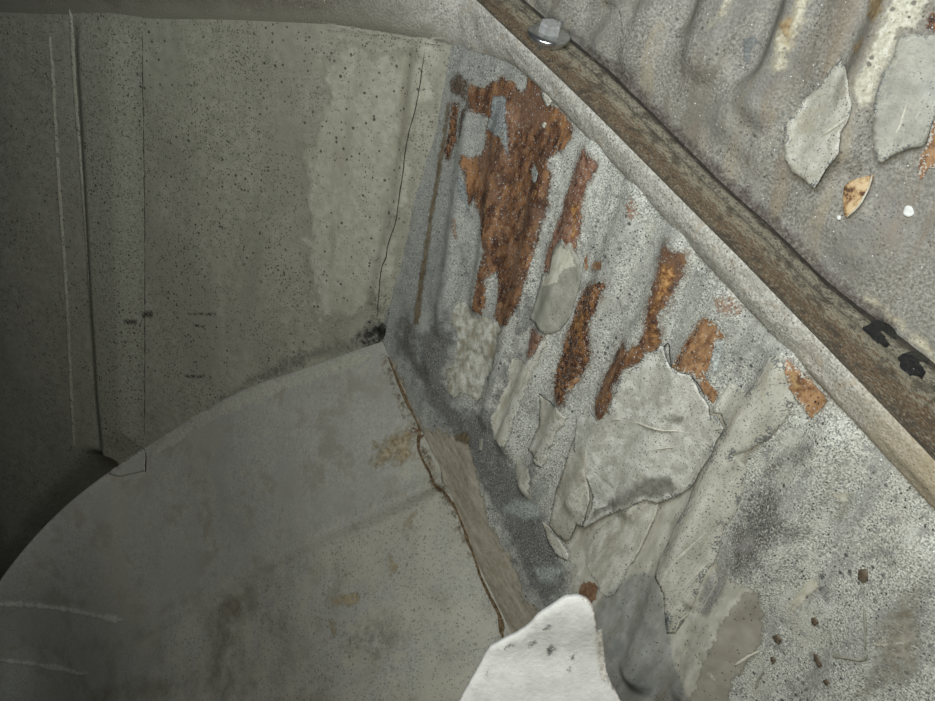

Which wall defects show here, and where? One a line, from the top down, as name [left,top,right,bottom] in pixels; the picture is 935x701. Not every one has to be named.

crack [366,34,440,320]
rust [413,74,572,327]
rust [544,149,598,273]
peeling [784,60,852,188]
peeling [872,34,935,163]
rust [554,281,605,406]
rust [595,242,686,419]
rust [672,317,725,403]
rust [784,358,826,418]
crack [388,357,505,638]
peeling [415,238,795,701]
rust [578,582,599,603]